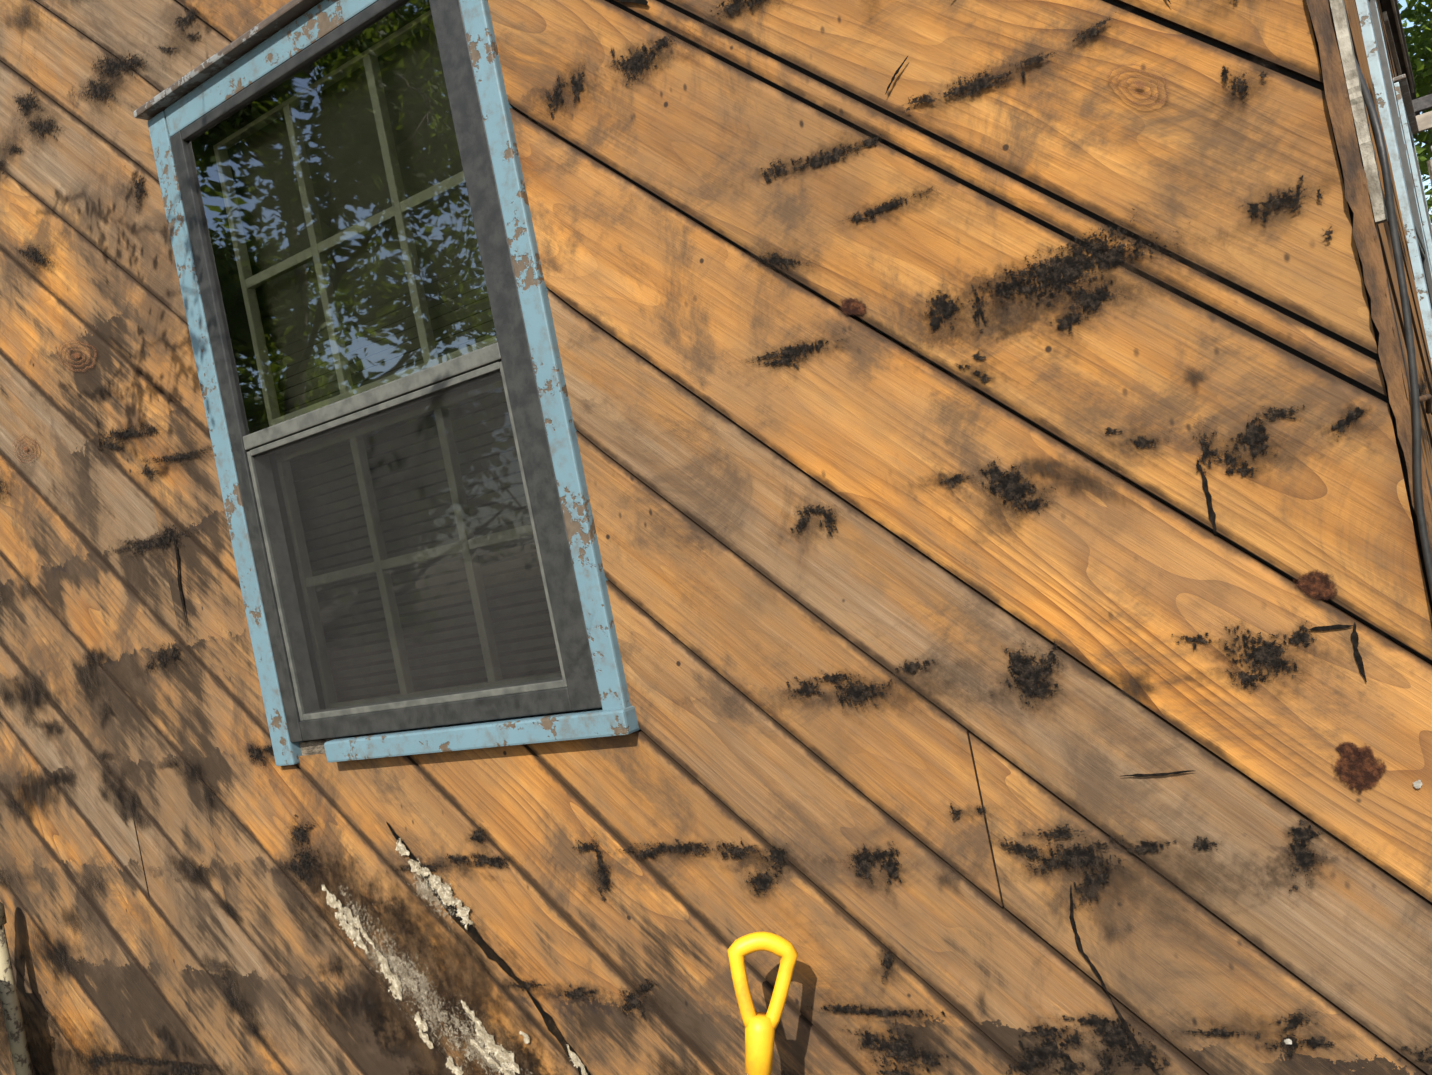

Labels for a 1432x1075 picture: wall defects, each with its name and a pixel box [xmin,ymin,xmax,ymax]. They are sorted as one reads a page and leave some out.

crack [1200,465,1216,534]
peeling [395,838,472,929]
peeling [322,884,402,1001]
damp [312,861,542,1075]
crack [1069,886,1160,1075]
peeling [414,1012,464,1075]
peeling [461,1000,530,1075]
peeling [565,1043,587,1075]